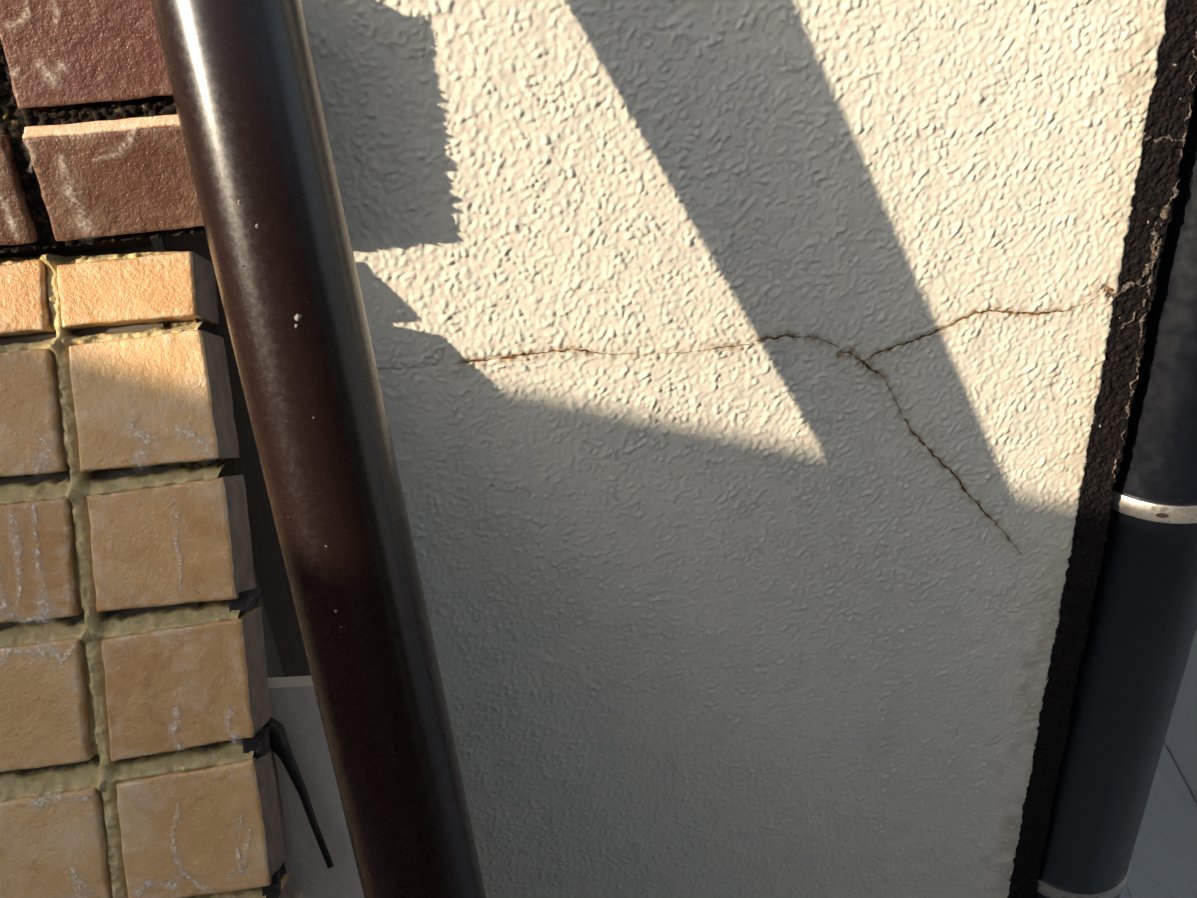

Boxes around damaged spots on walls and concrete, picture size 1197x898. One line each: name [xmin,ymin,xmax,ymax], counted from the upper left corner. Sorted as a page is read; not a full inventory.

water stain [0,504,52,622]
crack [455,294,1106,566]